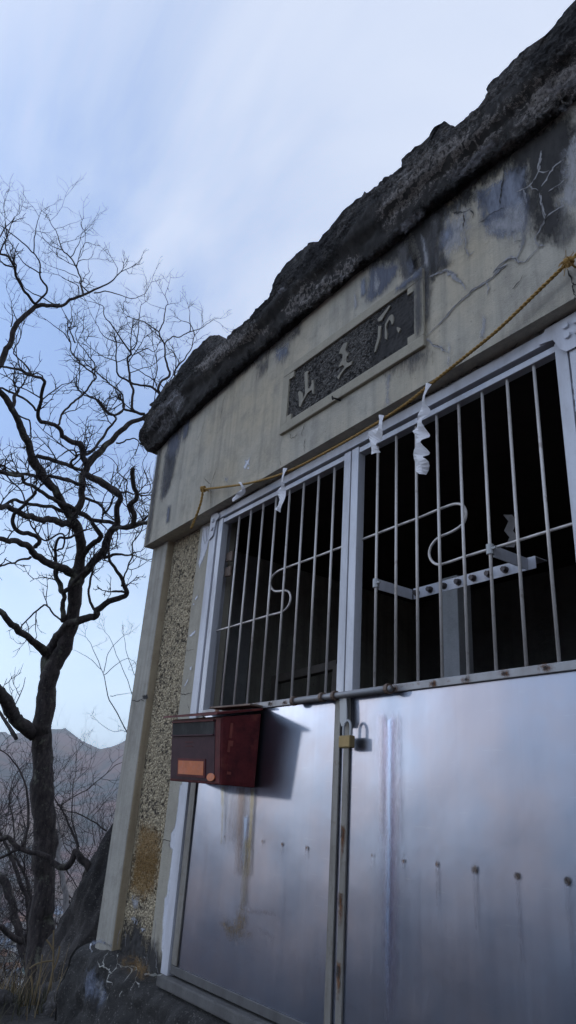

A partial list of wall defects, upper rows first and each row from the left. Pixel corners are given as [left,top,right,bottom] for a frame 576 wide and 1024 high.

water stain [143,70,576,544]
crack [426,152,564,353]
crack [98,917,163,998]
water stain [130,827,160,931]